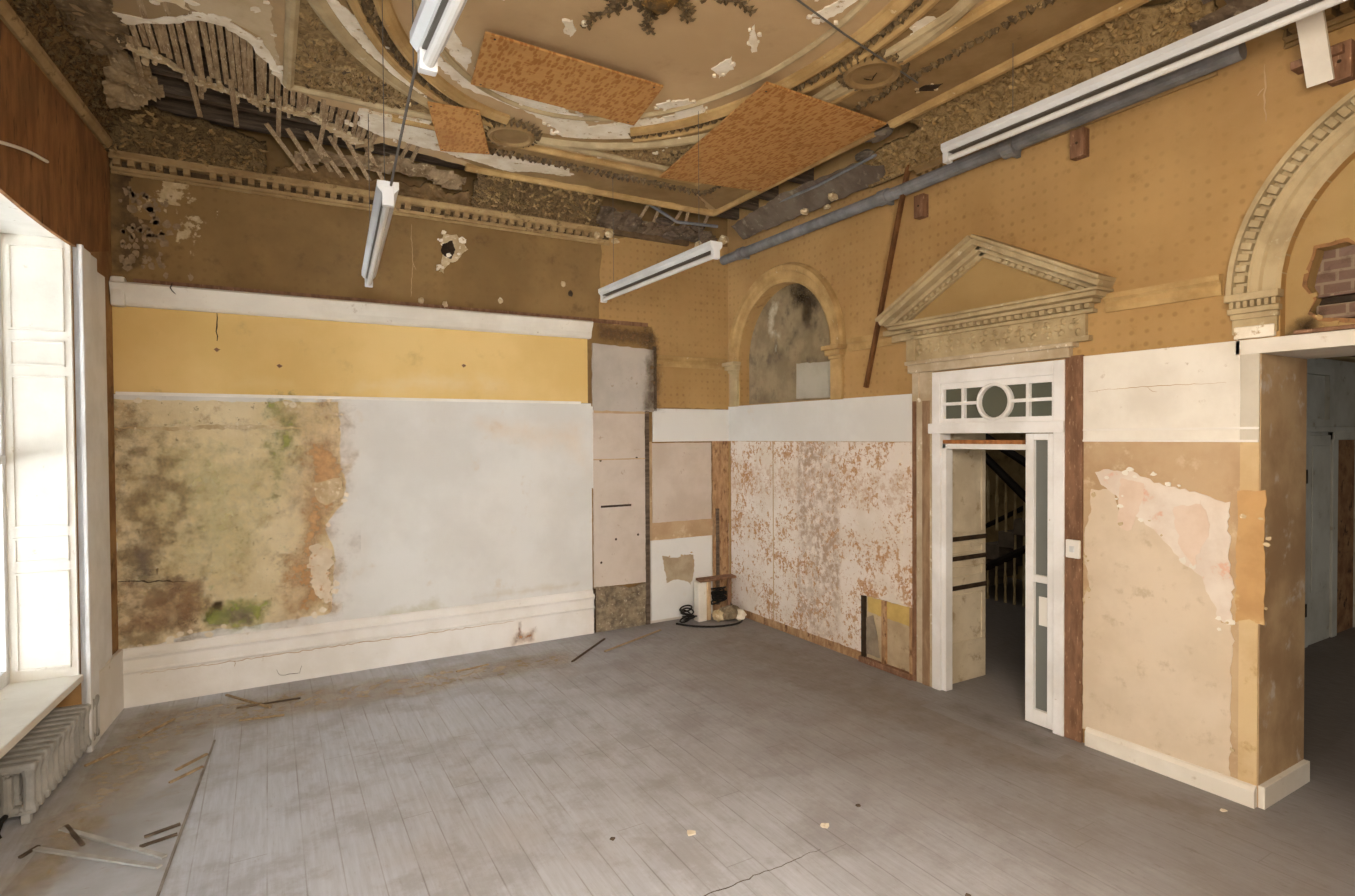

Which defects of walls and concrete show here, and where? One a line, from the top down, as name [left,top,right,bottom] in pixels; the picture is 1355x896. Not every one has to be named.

flaking render [53,0,574,190]
peeling [806,0,858,25]
flaking render [436,230,468,273]
water stain [114,369,420,650]
flaking render [1083,442,1240,779]